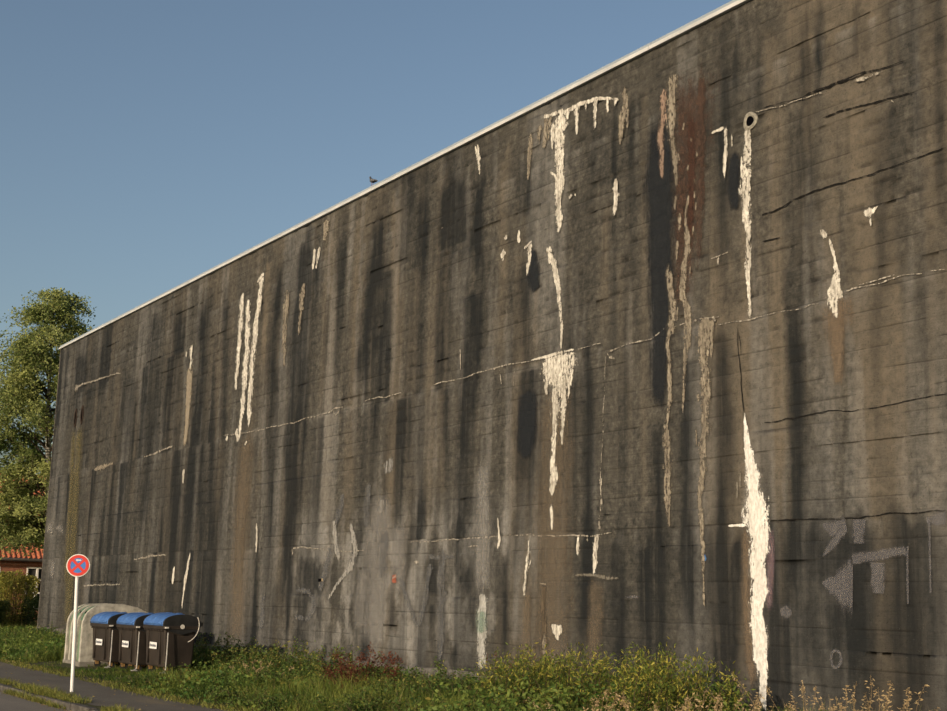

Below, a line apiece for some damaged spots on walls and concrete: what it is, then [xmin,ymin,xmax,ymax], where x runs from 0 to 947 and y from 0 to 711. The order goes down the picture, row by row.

corrosion [673,78,712,301]
crack [847,269,945,291]
crack [436,351,529,386]
water stain [643,74,714,606]
crack [578,303,819,411]
crack [224,407,342,436]
crack [764,394,944,423]
crack [409,439,612,564]
crack [767,510,945,522]
peeling [728,413,771,711]
peeling [476,594,488,668]